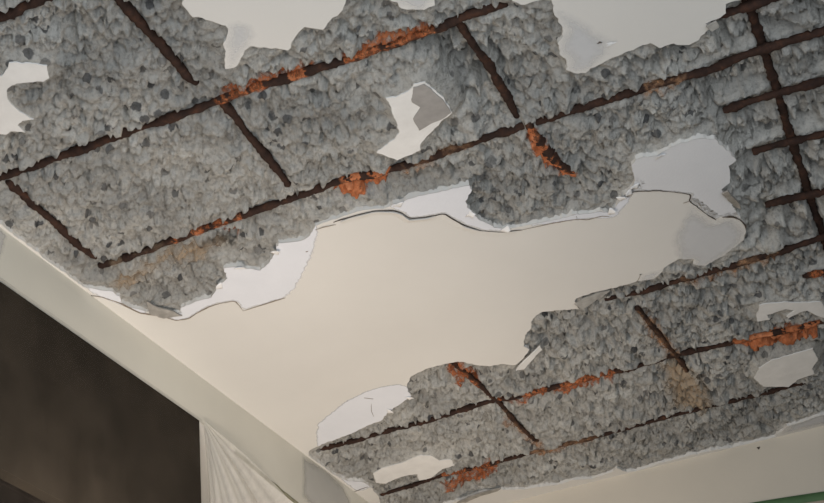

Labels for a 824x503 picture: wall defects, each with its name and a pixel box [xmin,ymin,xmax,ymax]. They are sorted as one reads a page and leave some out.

spalling [0,0,53,22]
spalling [115,0,199,86]
rust [342,22,435,63]
spalling [718,0,824,46]
rust [216,60,314,104]
spalling [535,26,824,126]
spalling [0,92,233,181]
rust [334,166,391,199]
spalling [5,180,97,259]
rust [732,320,820,351]
rust [497,369,615,455]
rust [441,458,499,493]